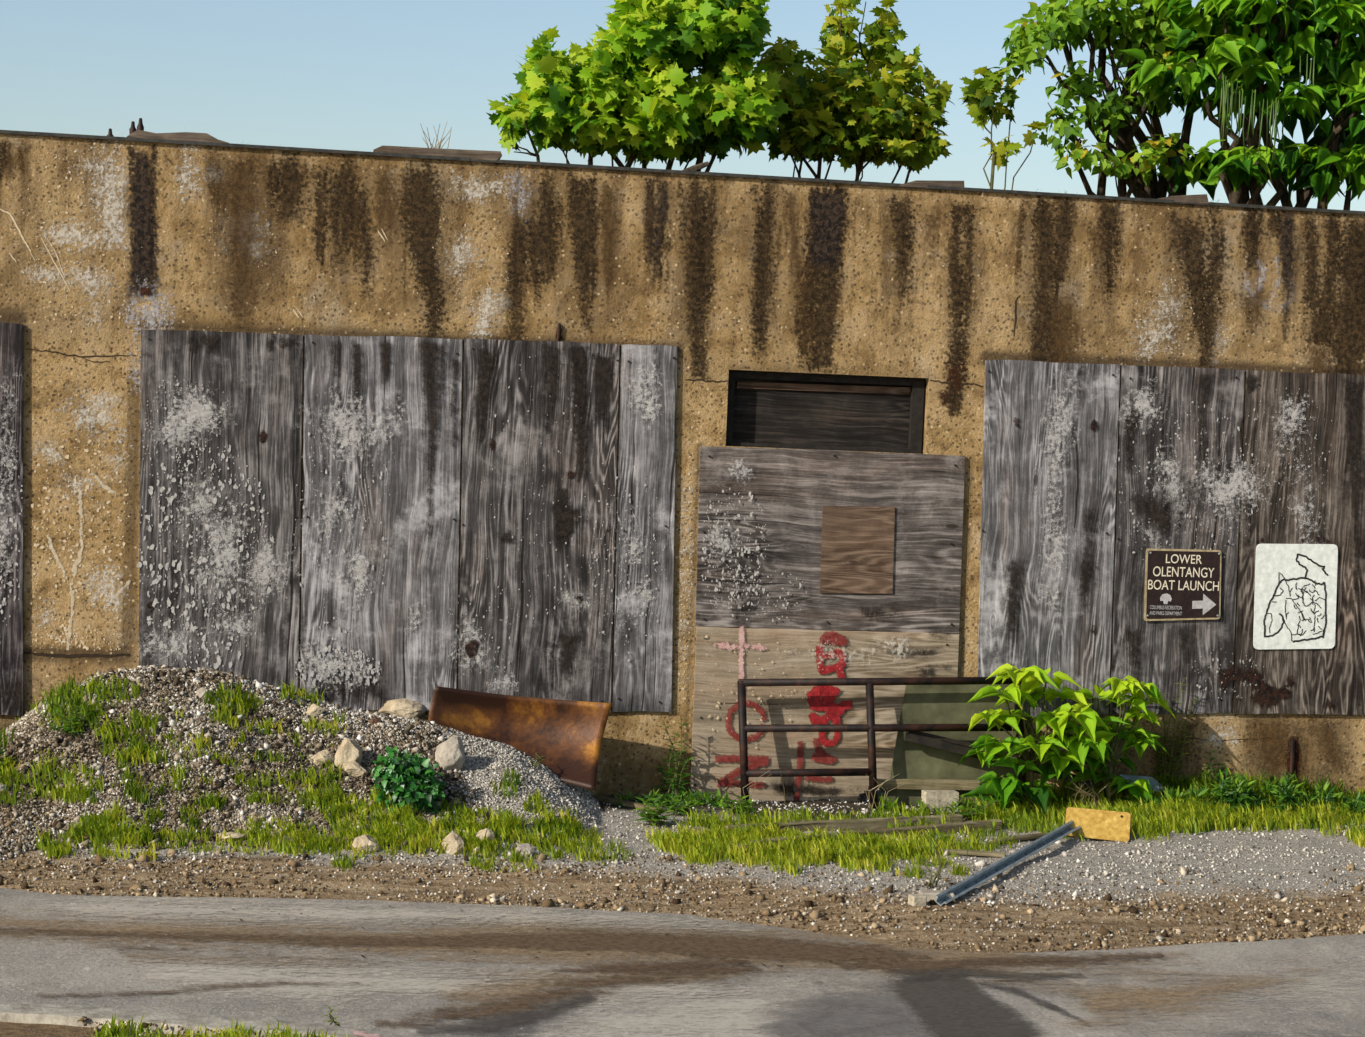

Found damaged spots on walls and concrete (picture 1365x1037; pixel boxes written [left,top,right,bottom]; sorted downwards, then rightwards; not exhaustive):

water stain [127,144,160,298]
water stain [207,152,458,548]
water stain [474,349,497,447]
water stain [502,170,616,341]
water stain [542,342,614,544]
water stain [643,177,721,384]
water stain [747,182,855,372]
water stain [886,195,978,418]
water stain [1012,196,1078,363]
water stain [1091,199,1124,301]
water stain [1122,407,1138,472]
water stain [1132,204,1365,601]